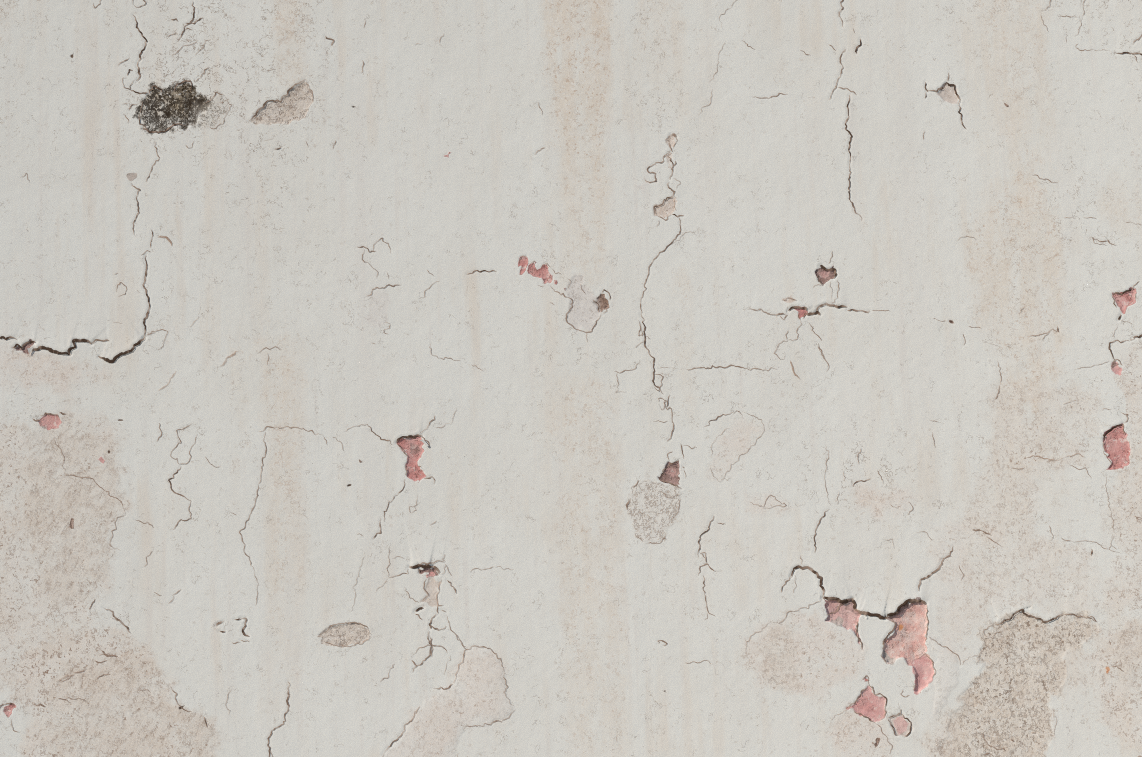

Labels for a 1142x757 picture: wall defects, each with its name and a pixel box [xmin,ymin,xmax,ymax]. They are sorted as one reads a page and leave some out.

leakage [122,0,340,148]
peeling [247,76,317,129]
crack [801,0,862,217]
crack [0,144,172,363]
peeling [514,252,612,341]
flaking render [1109,281,1140,320]
crack [616,219,888,477]
flaking render [393,431,435,486]
flaking render [653,456,684,490]
flaking render [1070,419,1135,475]
crack [918,547,964,591]
flaking render [746,593,939,757]